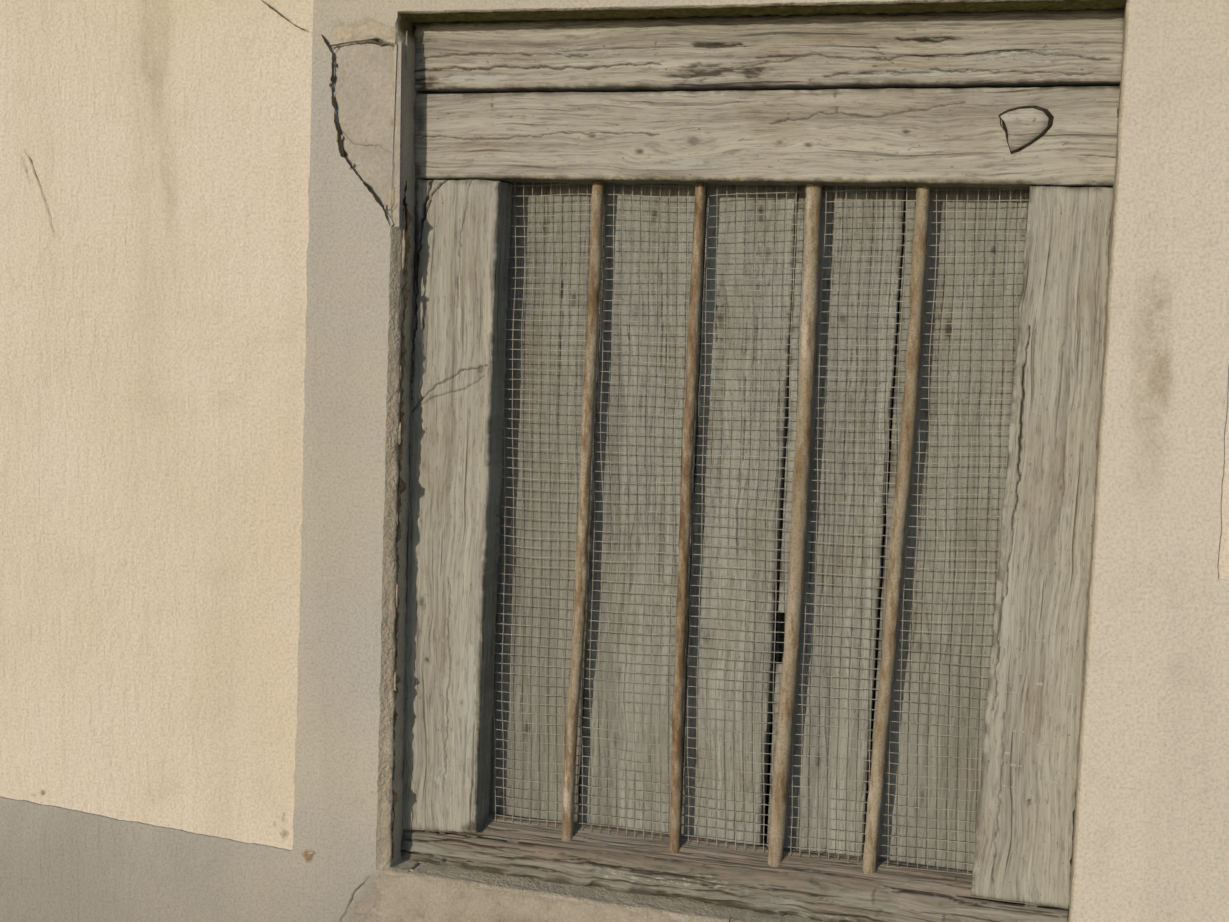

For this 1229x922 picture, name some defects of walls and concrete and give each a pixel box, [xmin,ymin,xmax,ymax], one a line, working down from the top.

crack [262,0,414,859]
flaking render [352,875,714,922]